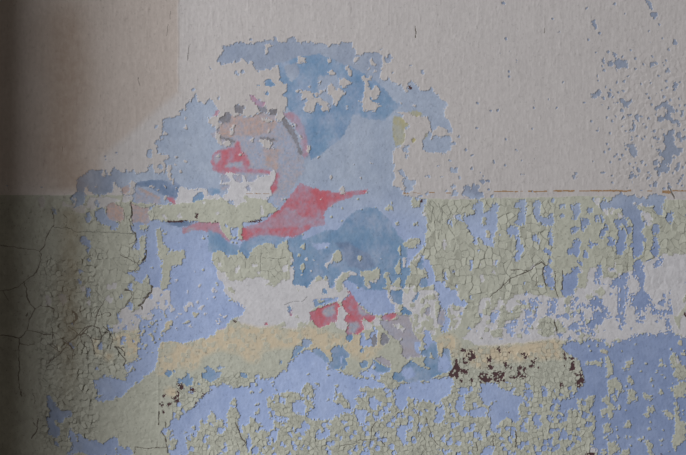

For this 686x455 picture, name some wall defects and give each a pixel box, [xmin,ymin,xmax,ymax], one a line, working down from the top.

crack [0,202,160,450]
peeling [46,395,133,455]
peeling [70,36,473,403]
peeling [161,49,686,455]